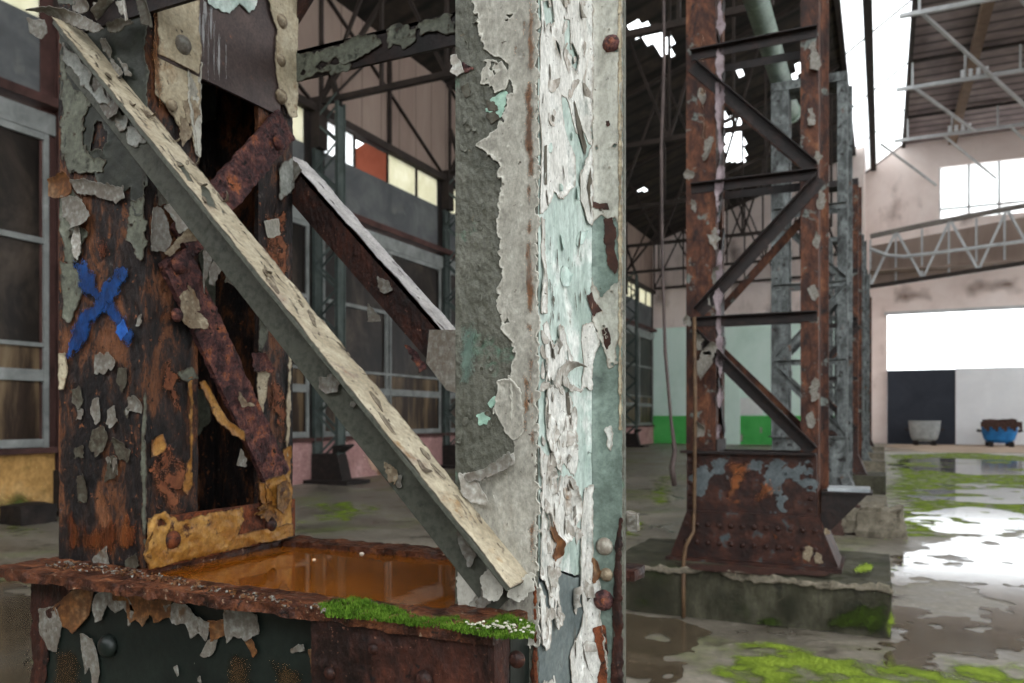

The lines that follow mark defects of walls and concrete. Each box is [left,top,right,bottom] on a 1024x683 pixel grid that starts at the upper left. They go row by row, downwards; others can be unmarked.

corrosion [153,13,162,103]
corrosion [523,12,533,67]
corrosion [525,83,534,194]
corrosion [267,212,288,275]
peeling [25,0,624,683]
corrosion [148,446,186,511]
peeling [688,458,729,497]
corrosion [730,463,748,493]
peeling [746,458,819,514]
corrosion [67,514,135,551]
corrosion [678,563,833,576]
corrosion [30,584,72,683]